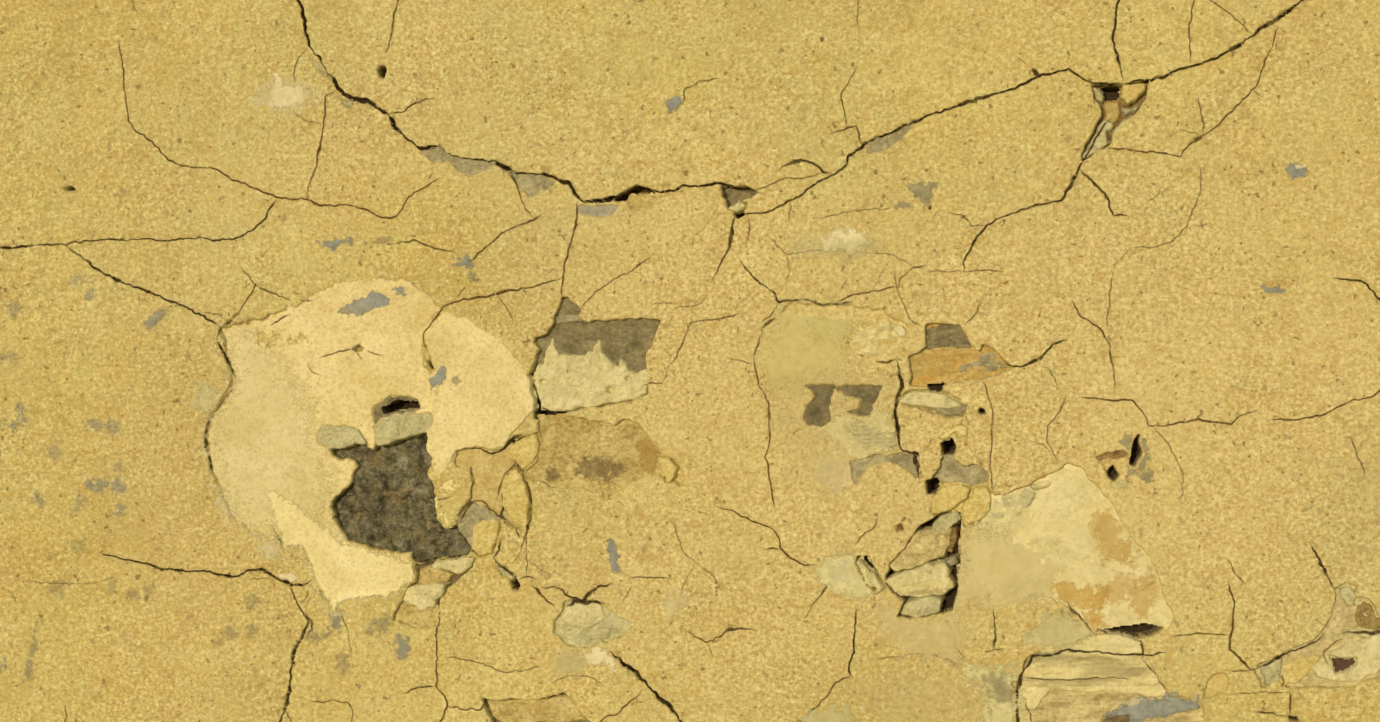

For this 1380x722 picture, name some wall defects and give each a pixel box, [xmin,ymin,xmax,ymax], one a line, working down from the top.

spalling [1082,83,1147,161]
peeling [199,277,680,628]
crack [438,435,688,606]
crack [0,0,1303,566]
spalling [805,385,882,427]
spalling [849,320,1012,412]
flaking render [851,425,1173,632]
crack [985,290,1380,486]
crack [102,526,353,722]
crack [599,653,683,722]
crack [916,565,1380,722]
spalling [1255,583,1380,687]